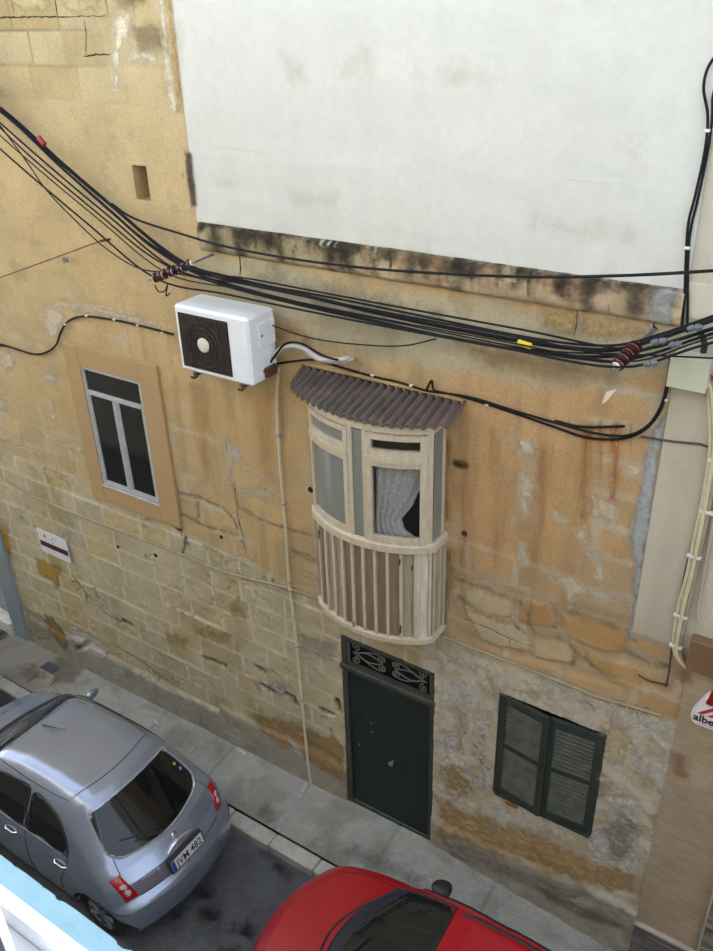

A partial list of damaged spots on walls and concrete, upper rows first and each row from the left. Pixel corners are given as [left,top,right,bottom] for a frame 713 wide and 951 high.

damp [197,222,678,315]